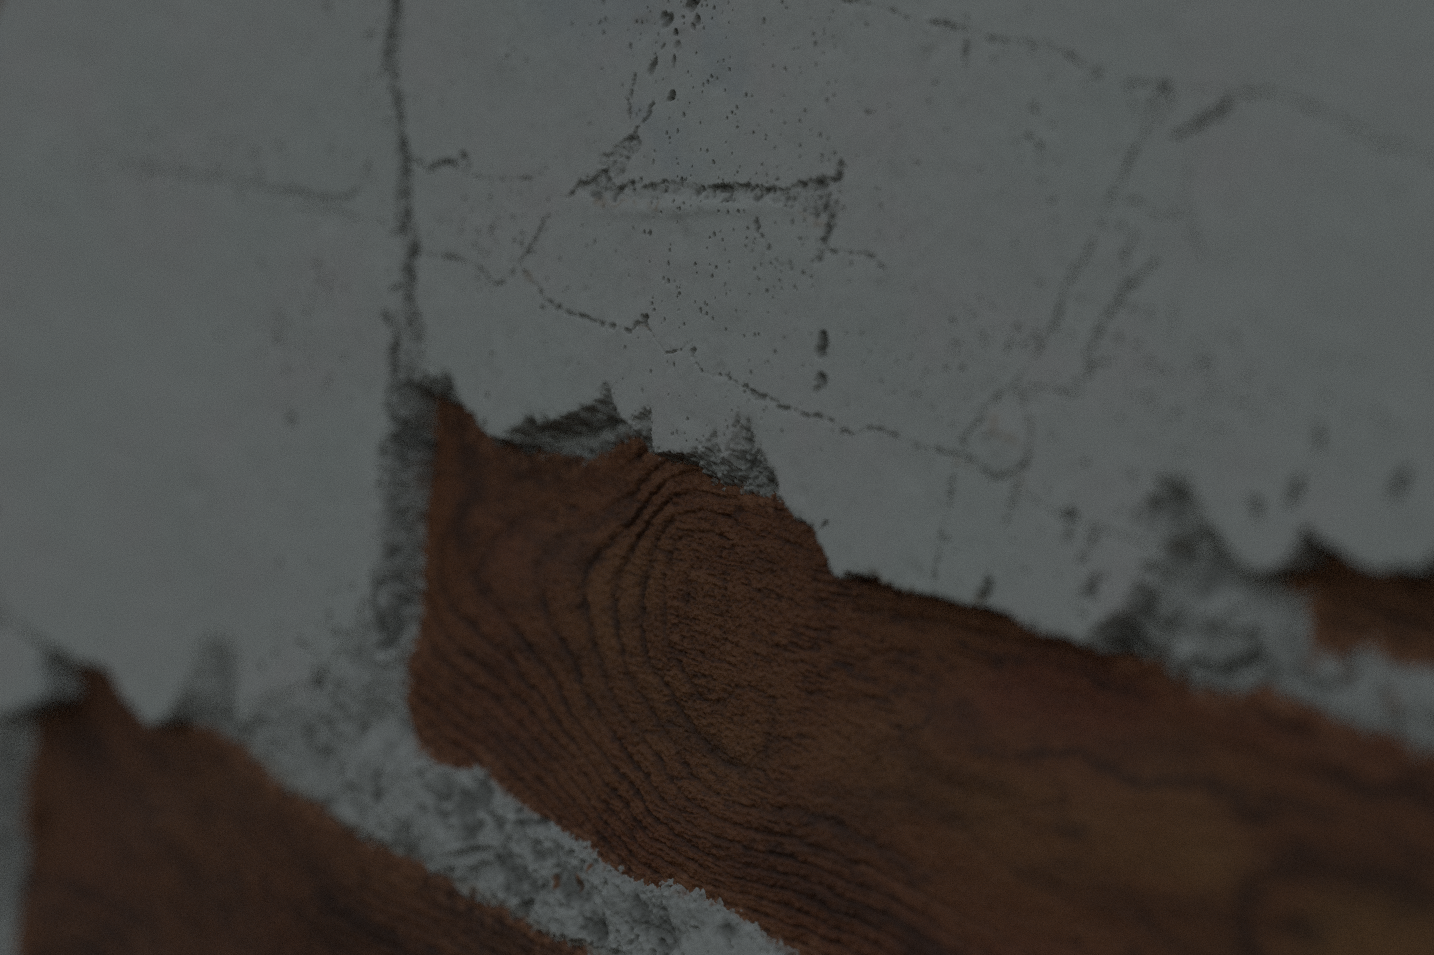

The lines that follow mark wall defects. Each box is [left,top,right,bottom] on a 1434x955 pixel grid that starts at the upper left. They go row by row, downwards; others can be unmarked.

crack [1171,89,1236,139]
crack [366,0,1152,655]
spalling [398,341,813,528]
spalling [353,458,429,724]
spalling [163,631,253,747]
spalling [0,711,54,863]